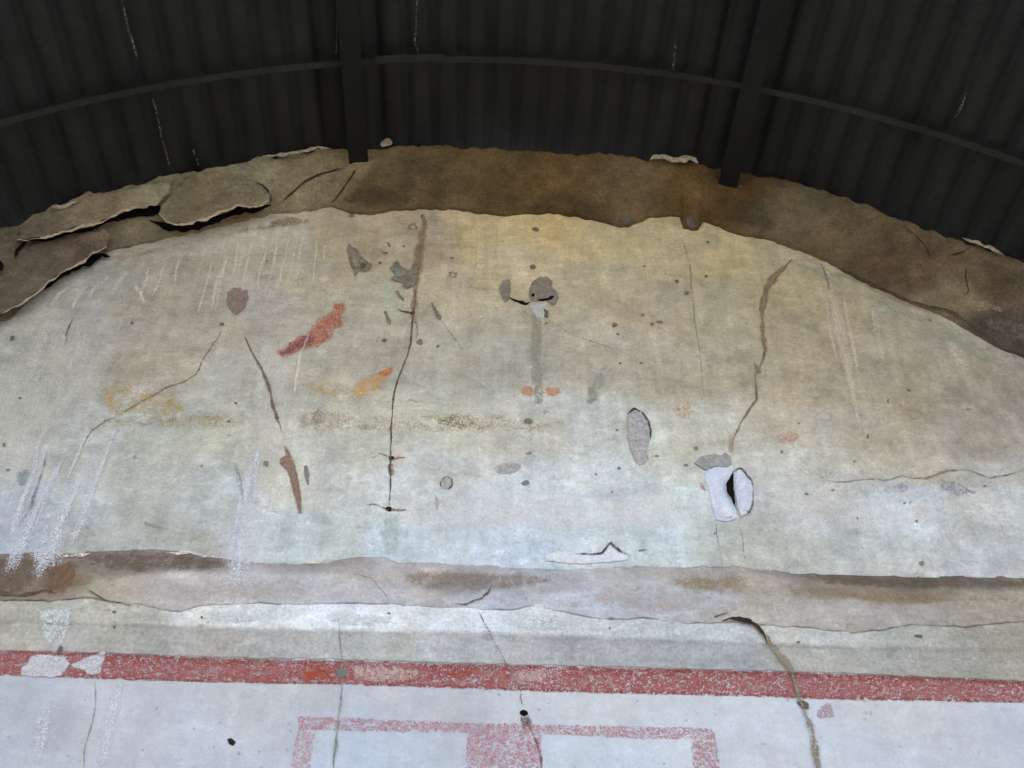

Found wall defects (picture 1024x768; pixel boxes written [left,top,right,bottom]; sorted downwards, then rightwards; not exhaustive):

water stain [650,154,698,163]
water stain [2,426,116,581]
crack [82,331,302,513]
spalling [347,242,419,301]
crack [369,214,428,511]
spalling [529,264,559,324]
spalling [616,408,659,466]
peeling [733,469,753,517]
crack [728,259,792,452]
water stain [797,260,861,429]
water stain [963,238,1003,254]
crack [714,613,821,768]